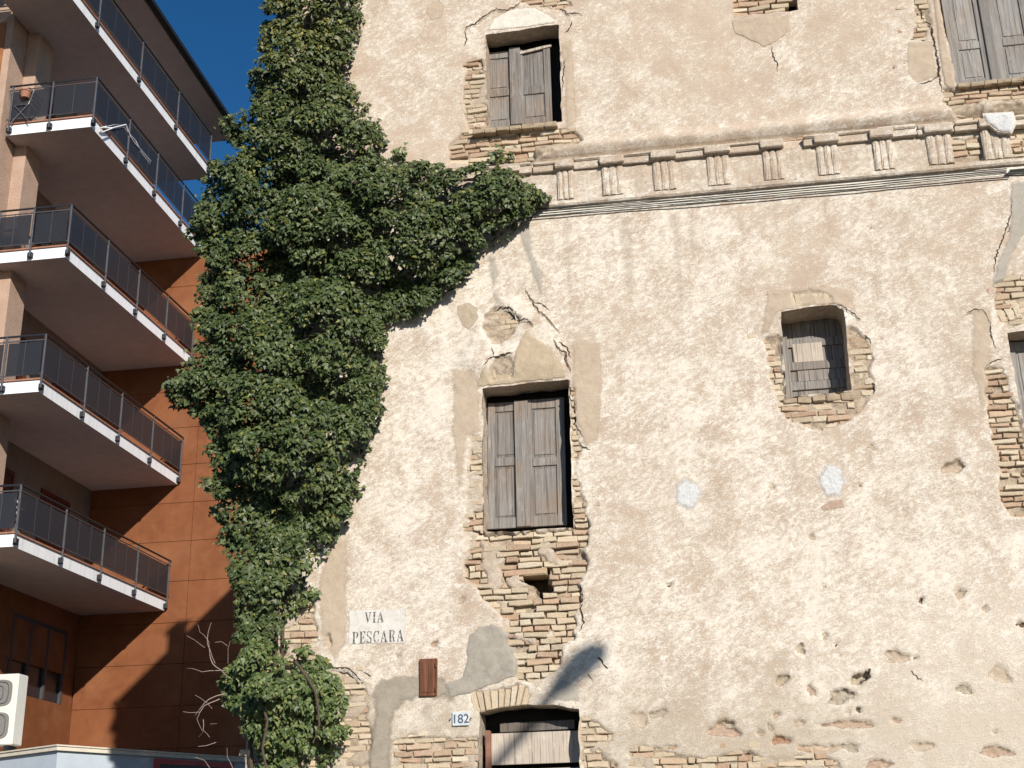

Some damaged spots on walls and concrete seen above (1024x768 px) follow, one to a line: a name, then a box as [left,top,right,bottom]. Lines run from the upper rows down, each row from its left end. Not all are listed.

crack [464,3,582,70]
flaking render [448,58,581,166]
crack [994,204,1012,267]
flaking render [986,274,1024,328]
crack [484,350,512,364]
crack [494,291,590,450]
flaking render [985,369,1024,517]
flaking render [462,387,600,712]
flaking render [279,666,372,768]
flaking render [391,731,478,768]
flaking render [580,713,859,768]
spalling [822,674,873,729]